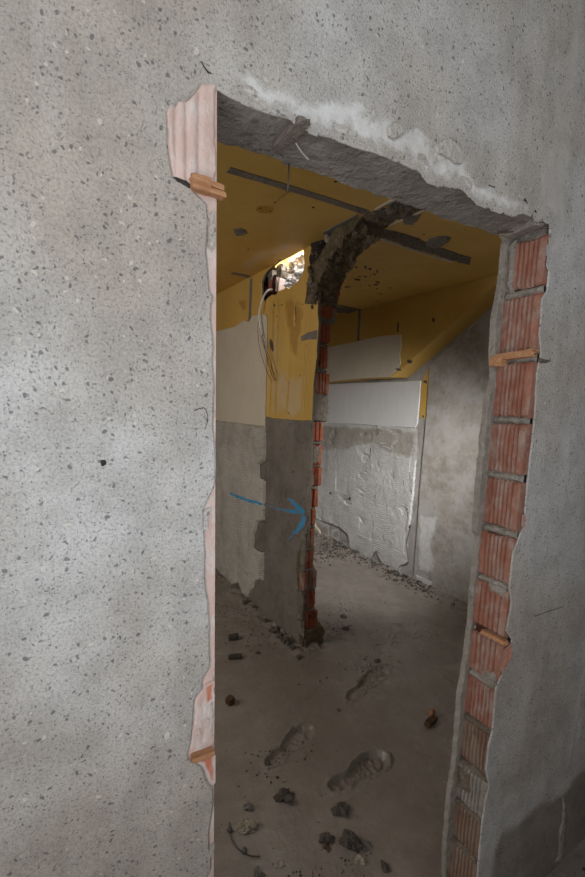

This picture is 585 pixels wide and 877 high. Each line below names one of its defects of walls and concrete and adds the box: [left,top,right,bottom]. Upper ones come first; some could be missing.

leakage [482,765,585,877]